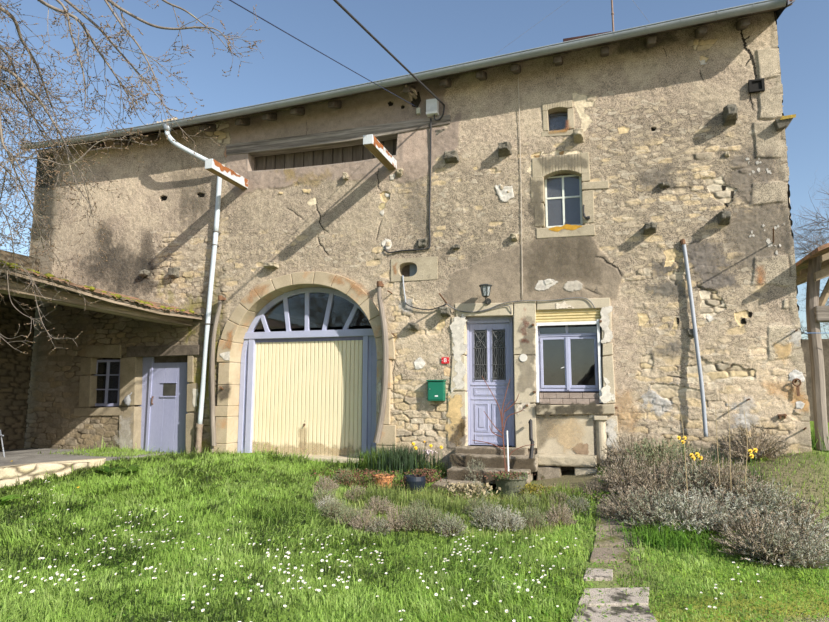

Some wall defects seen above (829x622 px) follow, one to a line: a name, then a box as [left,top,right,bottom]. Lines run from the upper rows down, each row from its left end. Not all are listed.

crack [740,30,757,110]
crack [288,203,329,255]
damp [530,236,593,287]
damp [687,151,794,290]